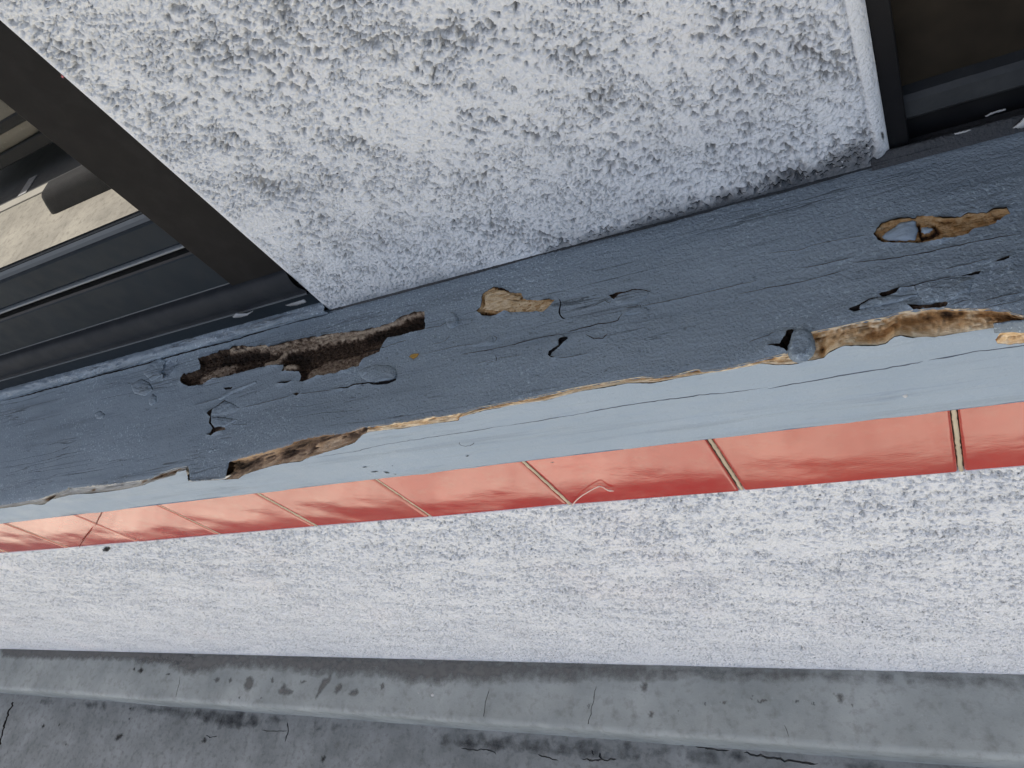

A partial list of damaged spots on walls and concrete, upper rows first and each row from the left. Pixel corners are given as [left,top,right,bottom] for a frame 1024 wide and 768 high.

peeling [483,290,552,312]
crack [474,236,1009,360]
peeling [993,320,1024,333]
crack [207,387,234,435]
crack [327,345,1024,456]